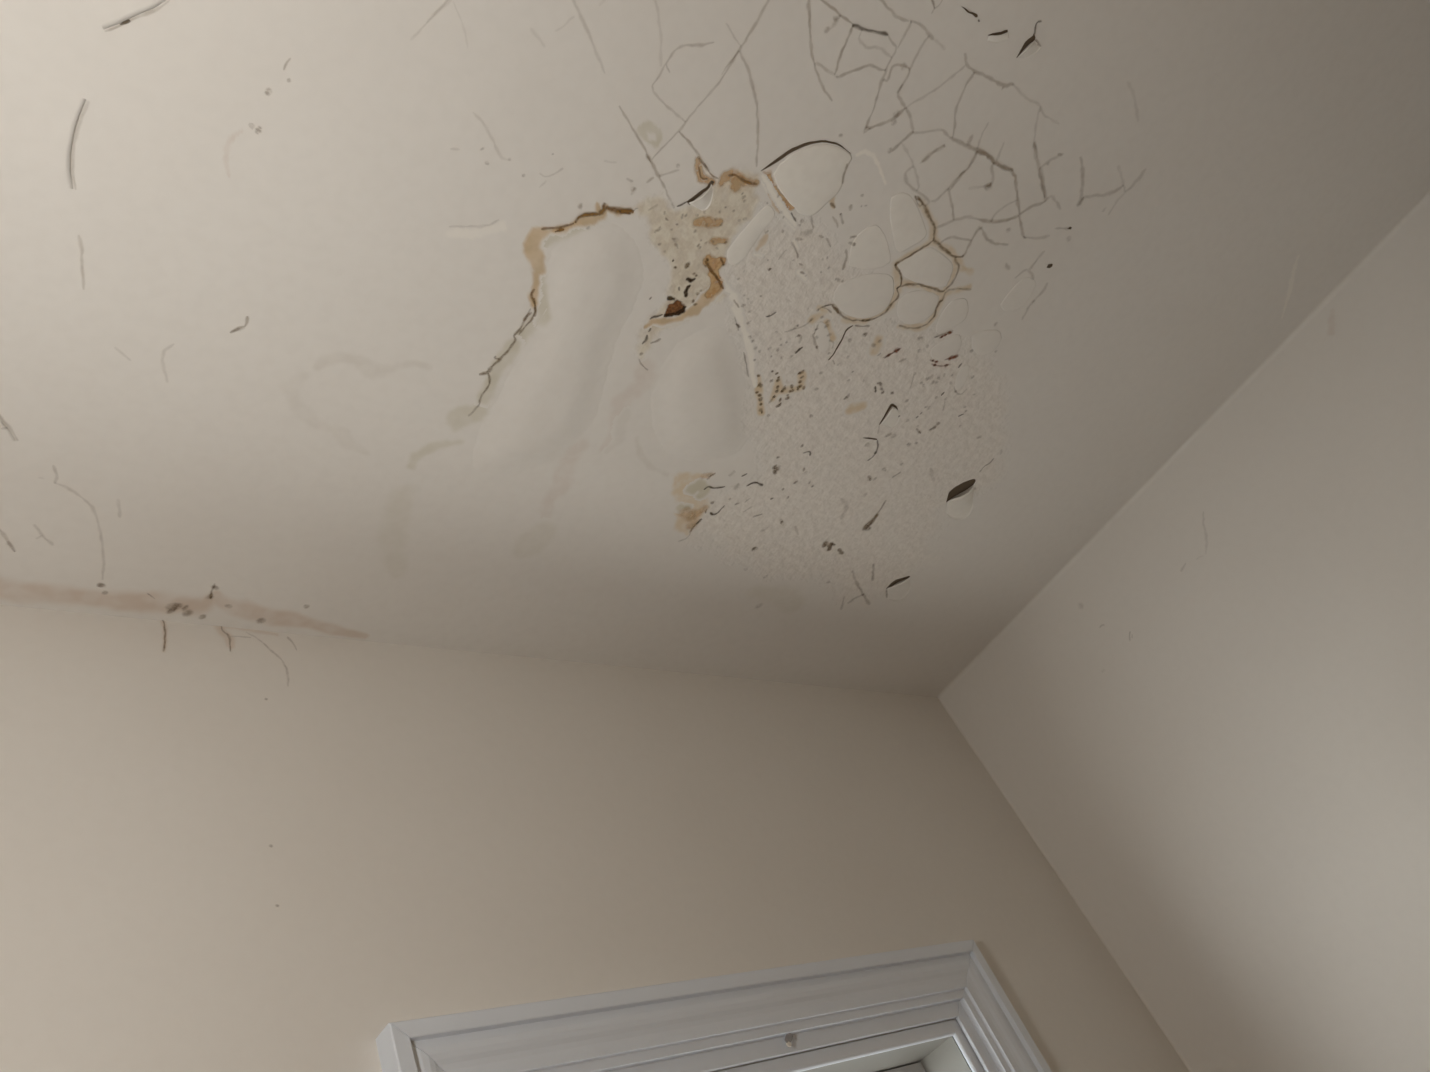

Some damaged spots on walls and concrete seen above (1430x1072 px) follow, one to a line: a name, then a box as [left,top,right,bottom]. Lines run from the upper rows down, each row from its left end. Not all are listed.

crack [848,24,888,43]
flaking render [631,140,953,362]
peeling [865,404,900,461]
peeling [946,479,976,520]